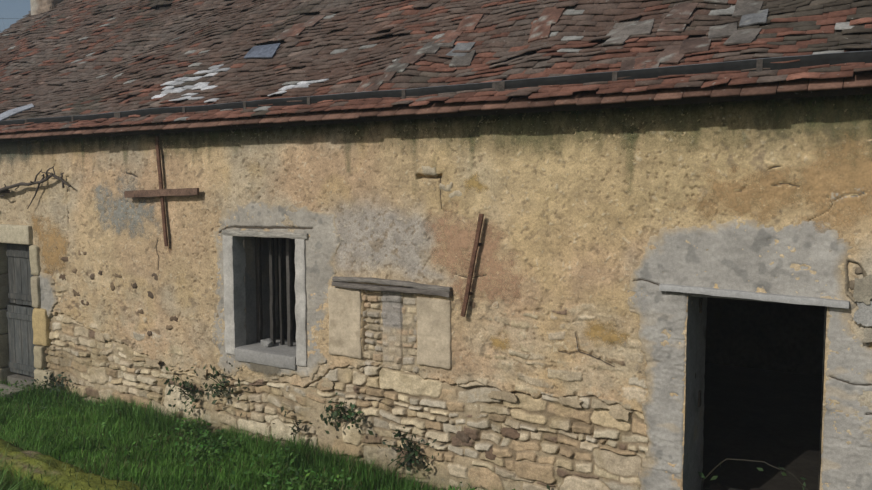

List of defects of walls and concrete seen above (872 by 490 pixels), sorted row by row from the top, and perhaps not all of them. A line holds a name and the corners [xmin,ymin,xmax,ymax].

damp [700,134,872,229]
crack [559,333,615,367]
spalling [500,427,520,440]